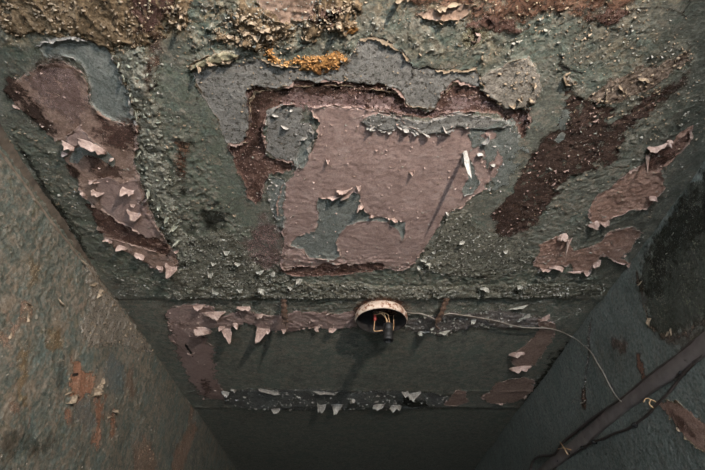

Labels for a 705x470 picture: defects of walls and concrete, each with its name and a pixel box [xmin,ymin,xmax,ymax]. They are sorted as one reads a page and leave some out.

peeling [600,0,698,84]
peeling [619,73,704,130]
flaking render [59,359,119,457]
peeling [659,399,705,453]